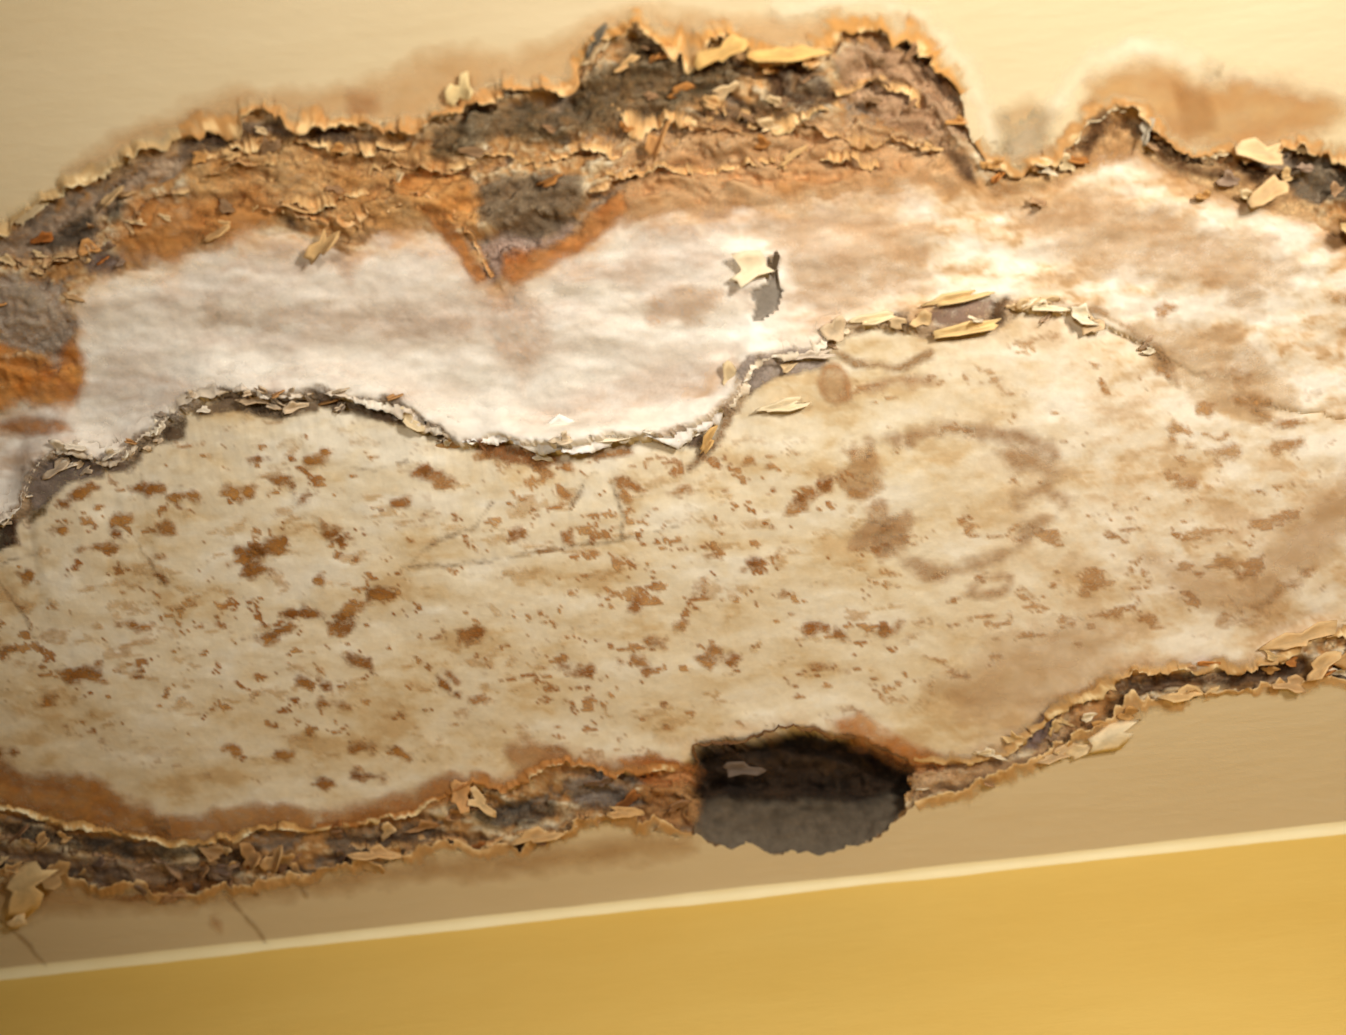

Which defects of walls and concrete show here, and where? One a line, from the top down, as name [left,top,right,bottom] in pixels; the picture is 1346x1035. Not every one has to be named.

water stain [322,59,493,118]
water stain [711,0,1339,156]
water stain [38,236,720,424]
spalling [0,7,1346,521]
corrosion [56,482,199,575]
corrosion [118,522,422,680]
crack [0,290,1174,550]
corrosion [485,457,725,628]
water stain [838,449,911,557]
corrosion [0,746,453,840]
peeling [0,754,716,930]
peeling [900,620,1346,818]